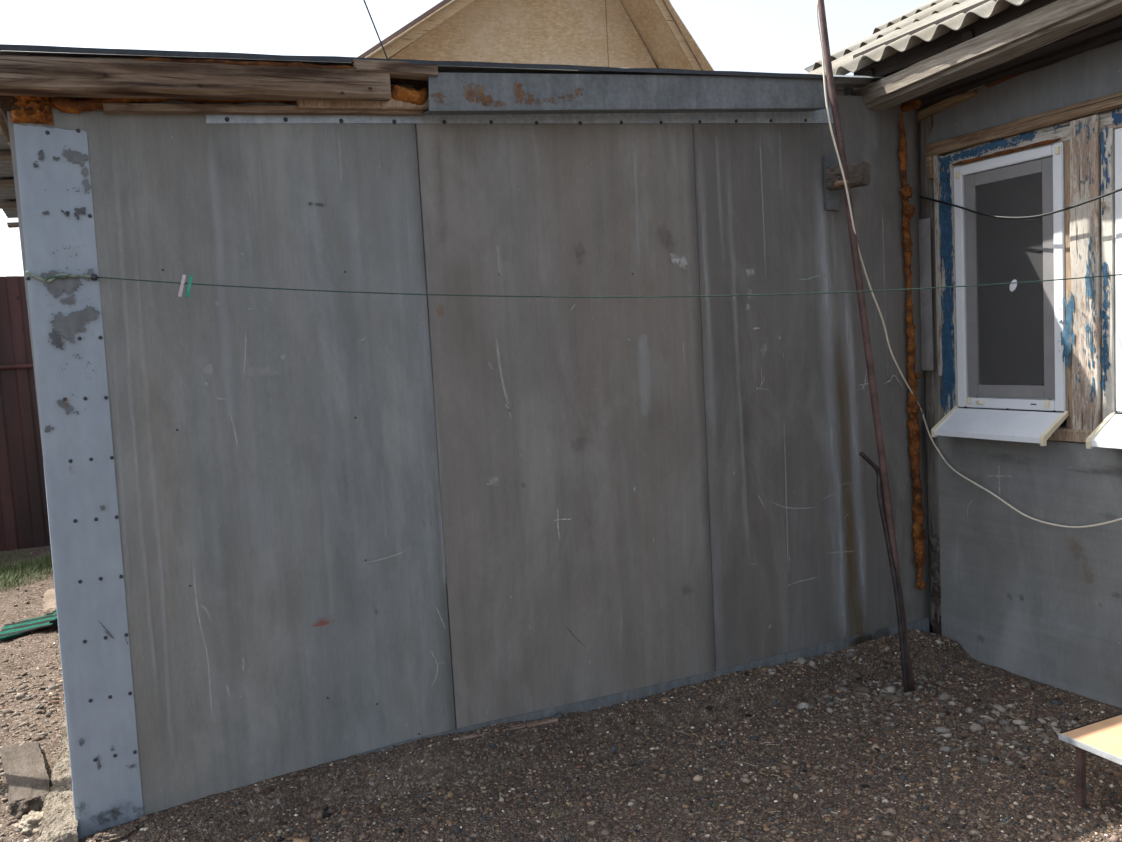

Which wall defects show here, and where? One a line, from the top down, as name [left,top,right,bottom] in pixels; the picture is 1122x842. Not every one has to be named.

peeling [33,145,91,193]
peeling [42,207,86,220]
peeling [40,240,100,374]
peeling [938,125,1061,412]
peeling [1058,237,1112,402]
peeling [1073,107,1122,215]